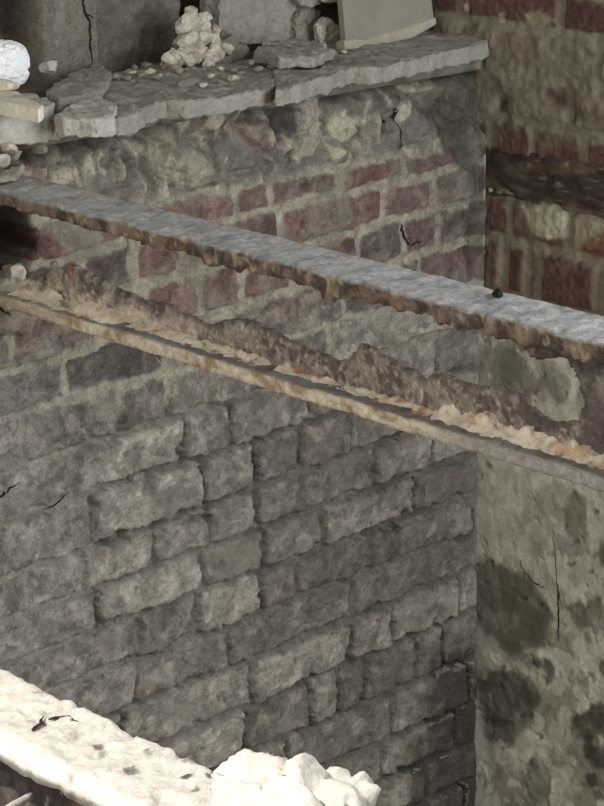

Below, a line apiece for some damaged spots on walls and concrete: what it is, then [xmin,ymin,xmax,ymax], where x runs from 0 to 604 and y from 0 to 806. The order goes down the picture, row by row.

crack [82,0,94,66]
crack [382,95,402,148]
spalling [582,234,604,258]
damp [475,559,551,657]
crack [520,528,564,639]
damp [534,659,554,684]
damp [572,704,604,799]